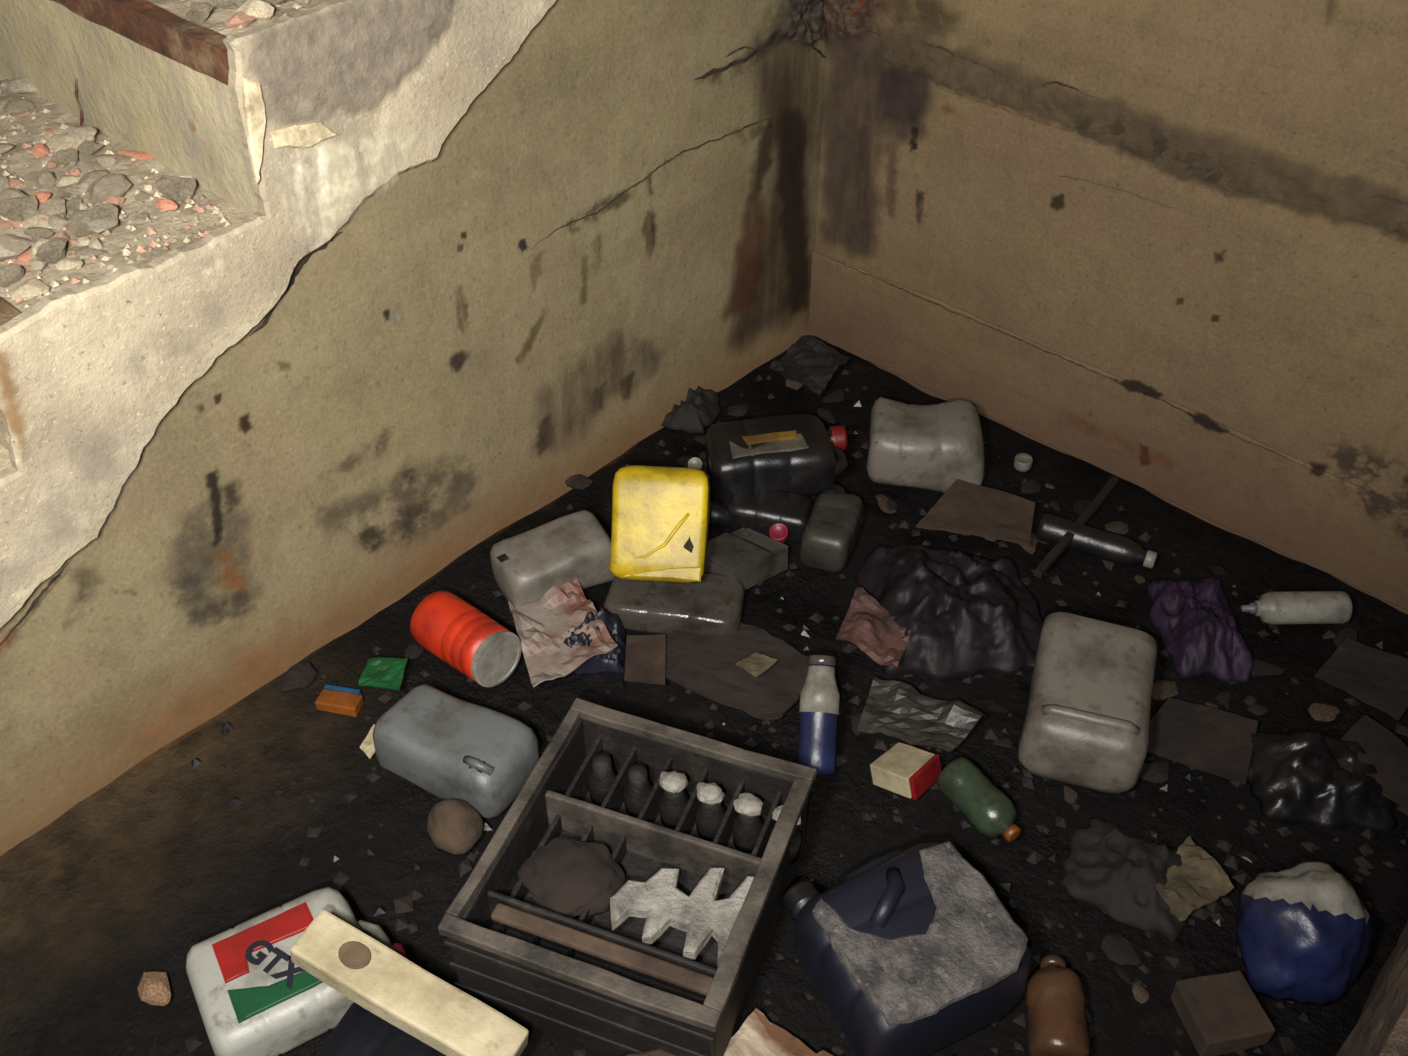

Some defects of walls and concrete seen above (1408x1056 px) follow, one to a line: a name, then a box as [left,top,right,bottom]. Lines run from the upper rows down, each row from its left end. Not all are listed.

crack [74,80,82,126]
crack [533,111,784,248]
crack [693,28,779,81]
leakage [735,47,808,345]
leakage [825,31,927,252]
crack [250,232,342,335]
leakage [178,472,246,621]
leakage [325,471,473,550]
crack [0,560,70,645]